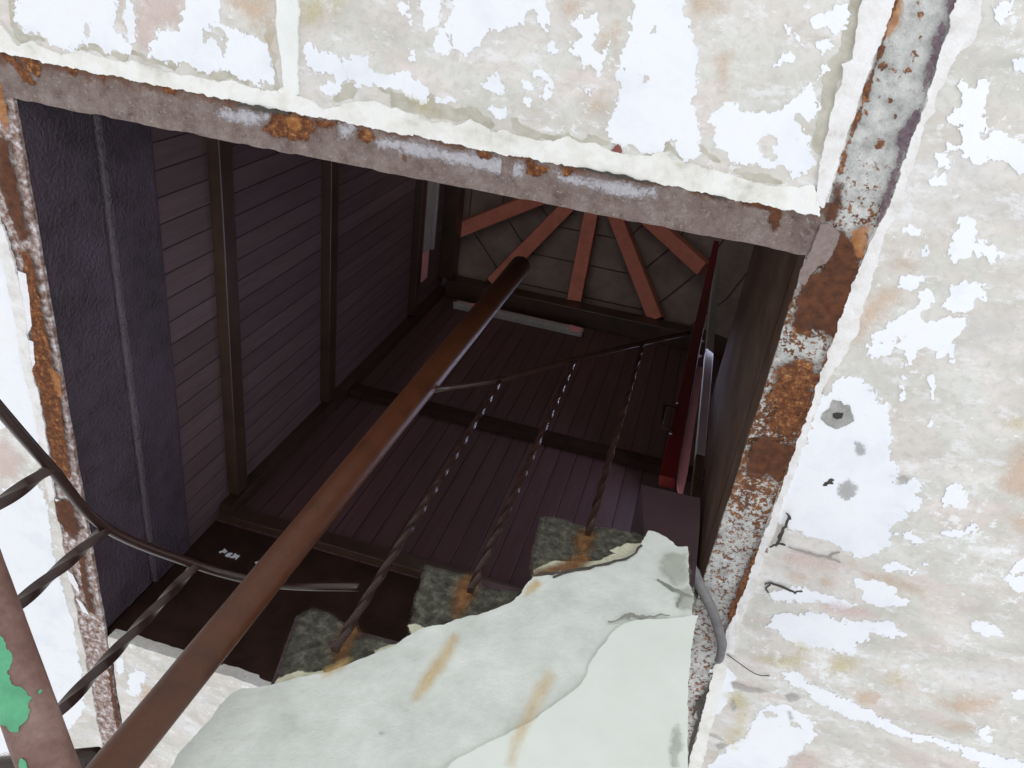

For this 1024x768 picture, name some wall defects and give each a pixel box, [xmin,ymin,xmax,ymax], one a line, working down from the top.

peeling [8,0,279,90]
rust [262,113,338,142]
peeling [303,0,862,185]
rust [792,0,922,342]
peeling [876,108,920,228]
rust [0,85,71,479]
rust [55,500,80,539]
rust [745,354,828,503]
peeling [765,274,987,656]
spalling [280,610,393,678]
spalling [409,566,520,635]
rust [728,541,768,624]